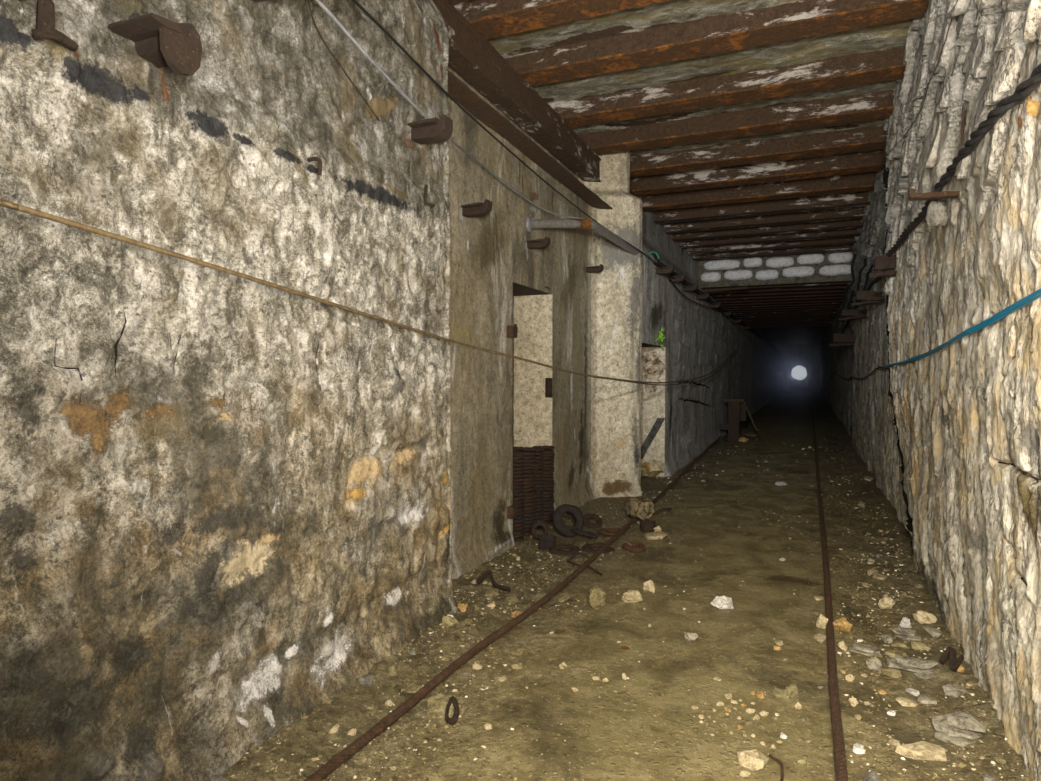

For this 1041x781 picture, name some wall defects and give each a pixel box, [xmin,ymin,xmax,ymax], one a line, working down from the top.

crack [882,147,890,254]
crack [54,339,83,404]
crack [111,312,127,378]
crack [884,279,914,555]
crack [998,462,1041,480]